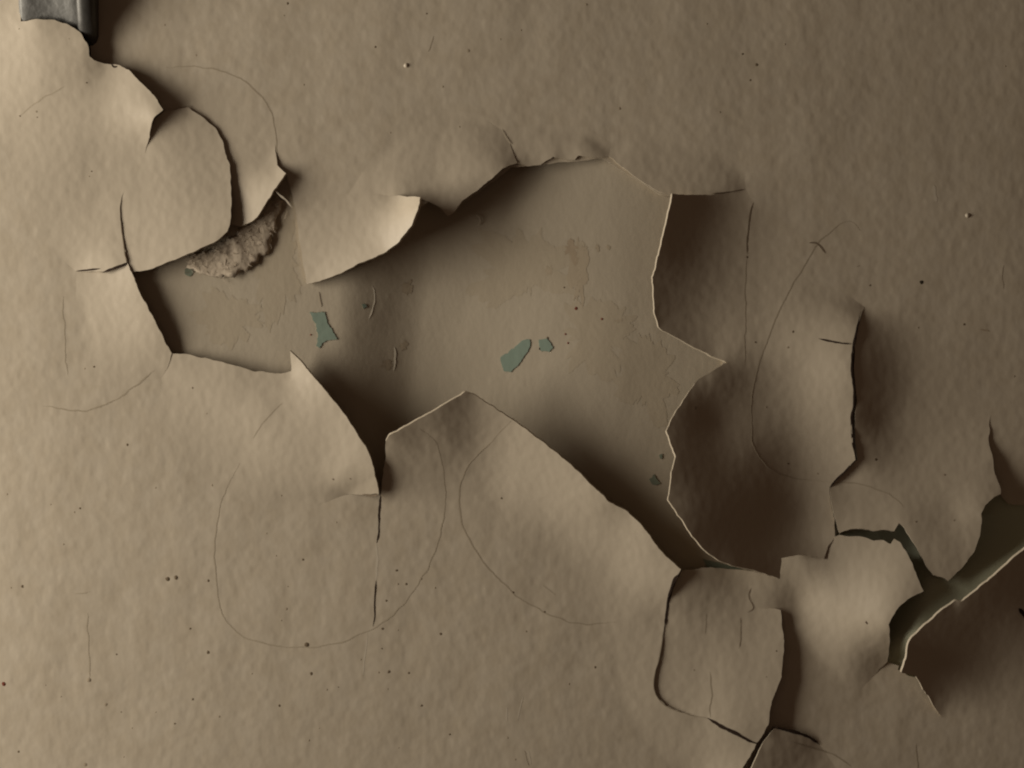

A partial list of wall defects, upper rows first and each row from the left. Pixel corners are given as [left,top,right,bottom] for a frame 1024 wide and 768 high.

crack [213,421,610,648]
flaking render [76,89,864,768]
crack [712,189,861,487]
peeling [665,297,1024,720]